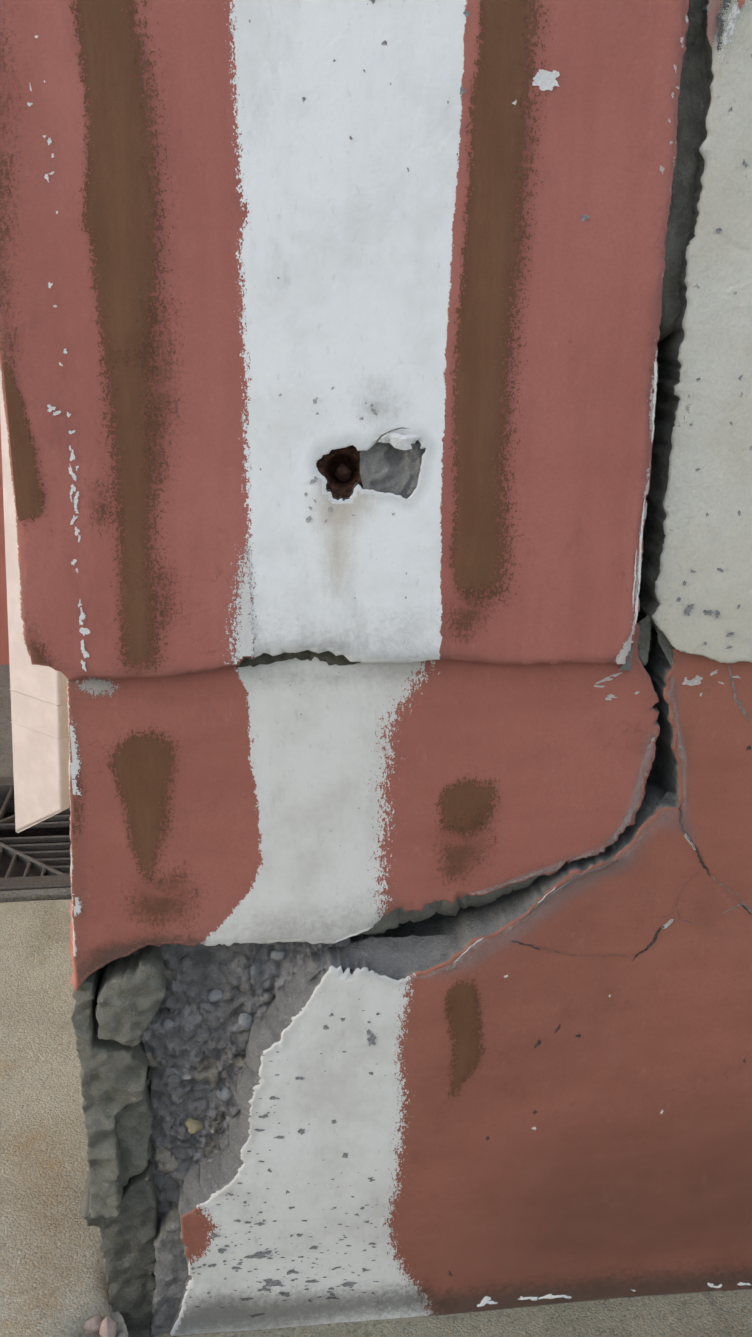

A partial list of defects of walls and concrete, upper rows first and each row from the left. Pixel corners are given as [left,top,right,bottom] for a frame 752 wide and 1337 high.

peeling [532,69,560,91]
spalling [304,427,426,523]
crack [304,0,752,984]
spalling [71,937,381,1337]